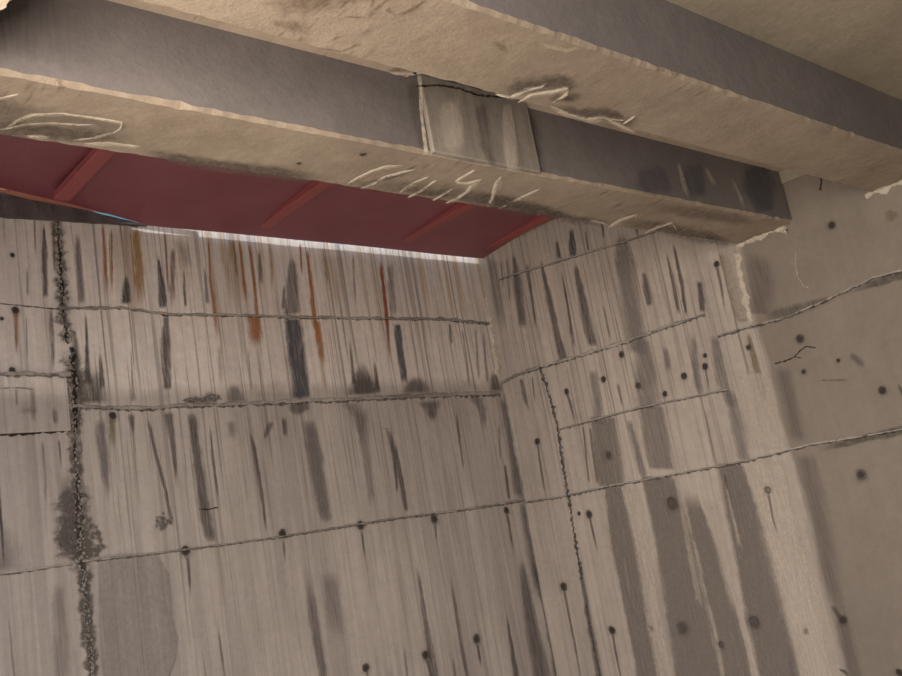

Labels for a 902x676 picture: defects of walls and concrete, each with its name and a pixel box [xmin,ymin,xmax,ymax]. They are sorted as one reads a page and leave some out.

damp [0,113,140,147]
rust [102,228,113,281]
rust [130,233,143,290]
rust [208,242,216,319]
rust [233,242,259,340]
rust [299,246,323,358]
rust [380,265,389,345]
crack [539,367,583,579]
crack [586,605,601,676]